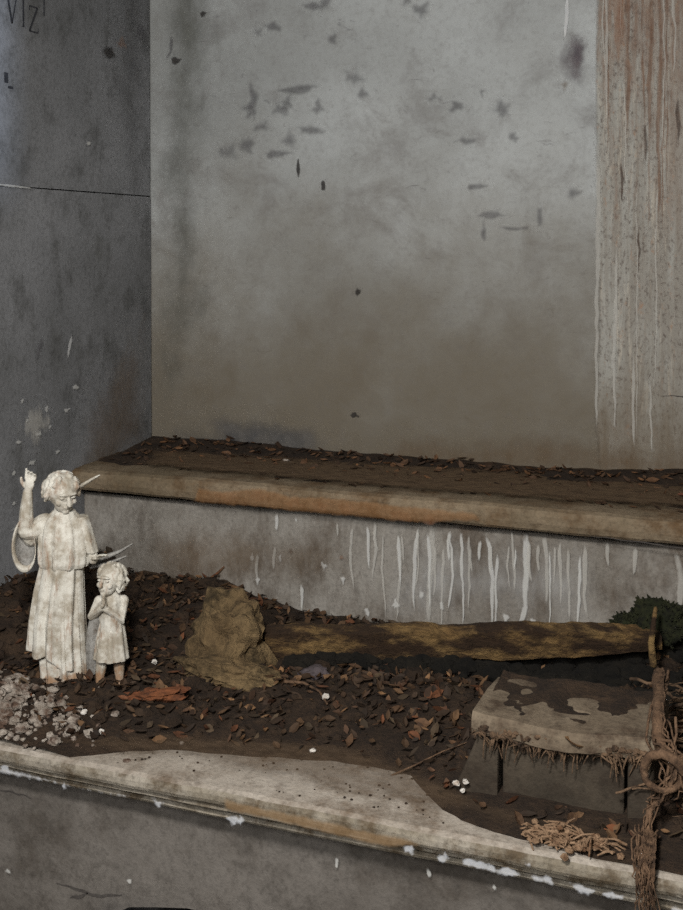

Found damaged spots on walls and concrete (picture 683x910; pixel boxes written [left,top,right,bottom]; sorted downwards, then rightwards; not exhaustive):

corrosion [596,0,683,470]
efflorescence [413,532,431,604]
efflorescence [441,534,464,617]
efflorescence [478,542,508,621]
efflorescence [514,540,533,621]